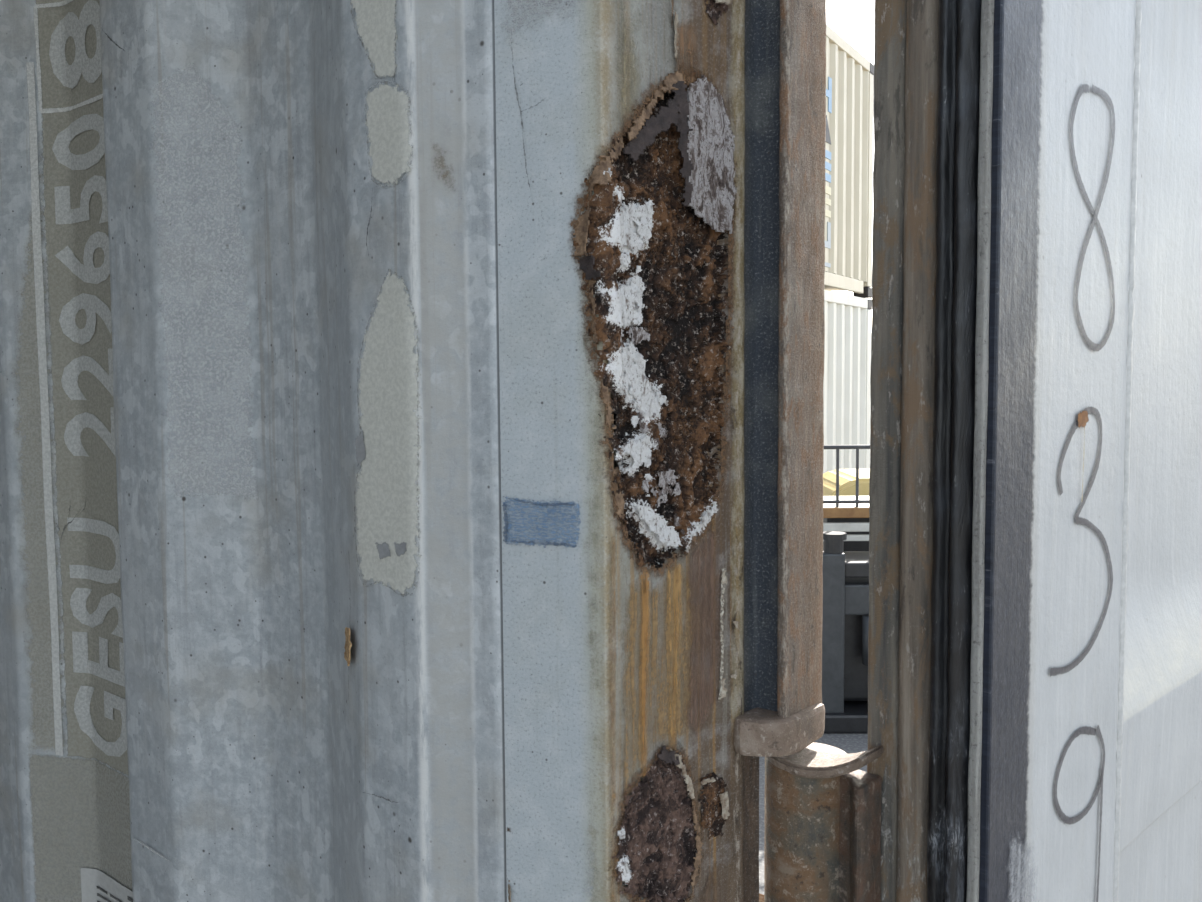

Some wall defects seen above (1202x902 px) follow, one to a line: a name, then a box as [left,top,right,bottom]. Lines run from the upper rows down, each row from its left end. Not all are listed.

peeling [351,0,413,188]
rust [705,0,732,25]
peeling [354,269,423,596]
rust [570,62,737,902]
crack [505,880,513,902]